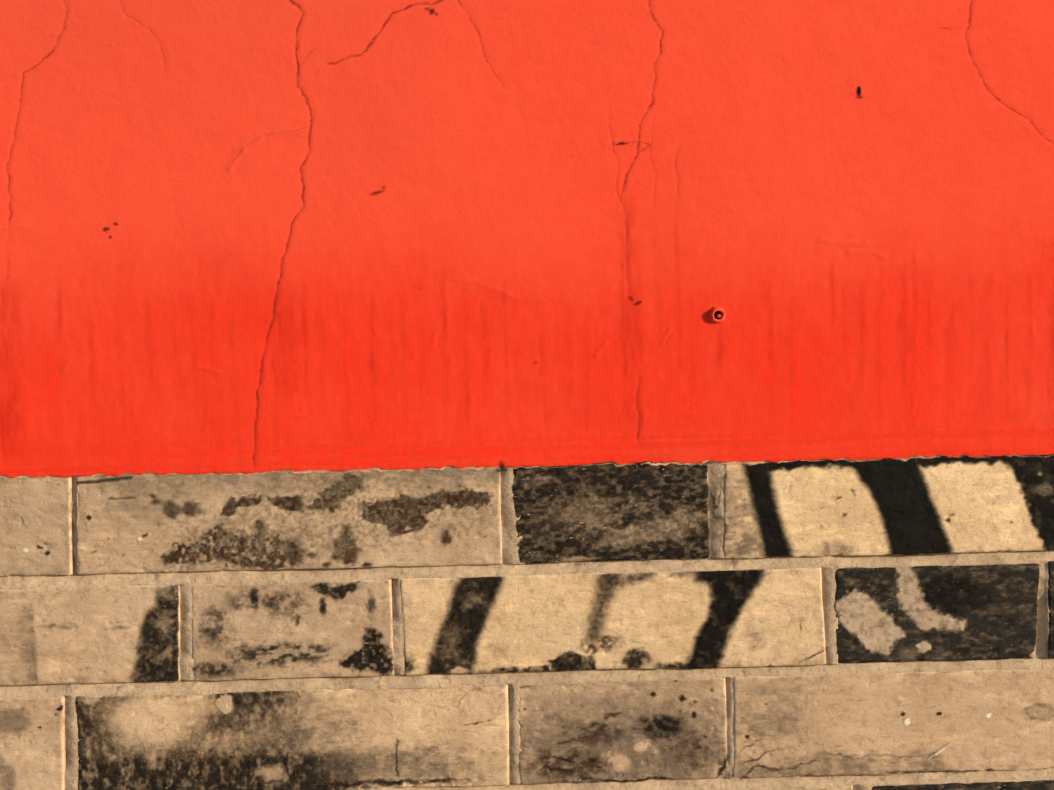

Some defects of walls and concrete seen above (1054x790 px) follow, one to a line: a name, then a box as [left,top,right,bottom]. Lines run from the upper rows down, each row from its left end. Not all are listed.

crack [364,0,441,52]
crack [253,0,312,460]
water stain [0,294,1054,565]
water stain [521,701,713,782]